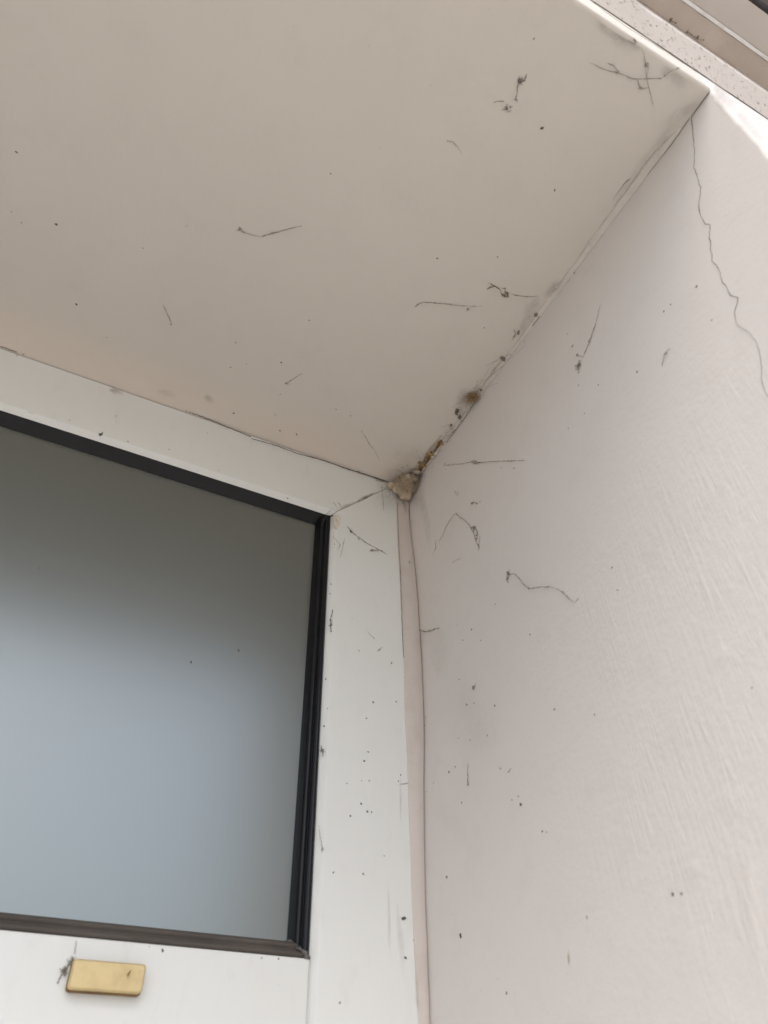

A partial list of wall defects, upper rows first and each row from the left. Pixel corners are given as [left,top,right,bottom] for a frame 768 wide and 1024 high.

crack [592,1,767,395]